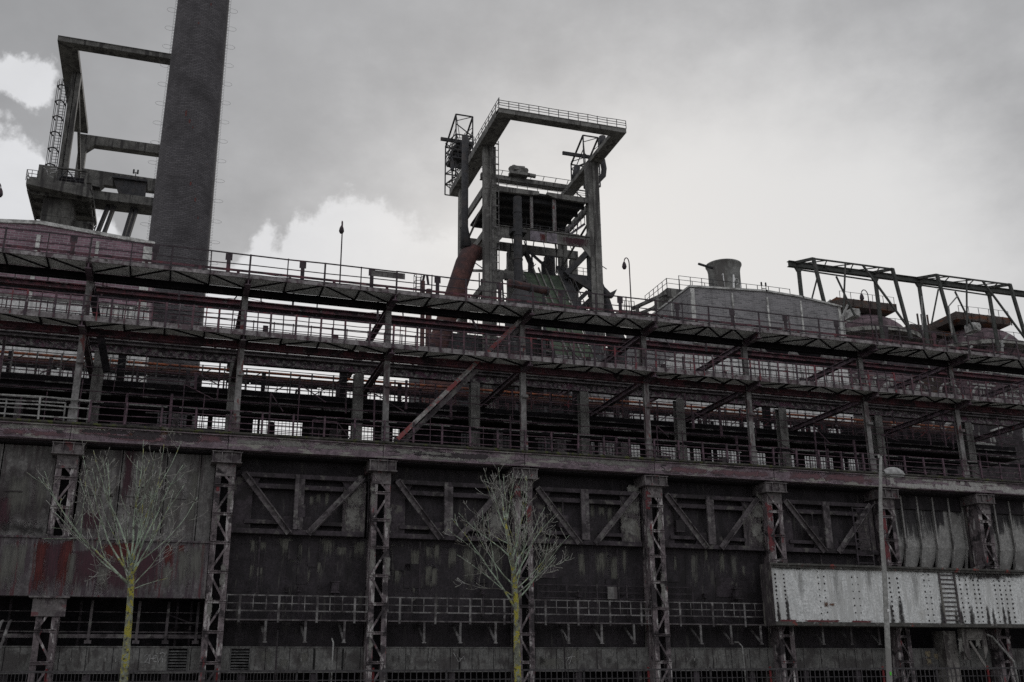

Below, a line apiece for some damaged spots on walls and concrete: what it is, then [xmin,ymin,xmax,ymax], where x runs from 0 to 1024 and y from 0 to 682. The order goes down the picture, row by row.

water stain [895,509,944,538]
water stain [990,514,1024,534]
rust [32,541,185,592]